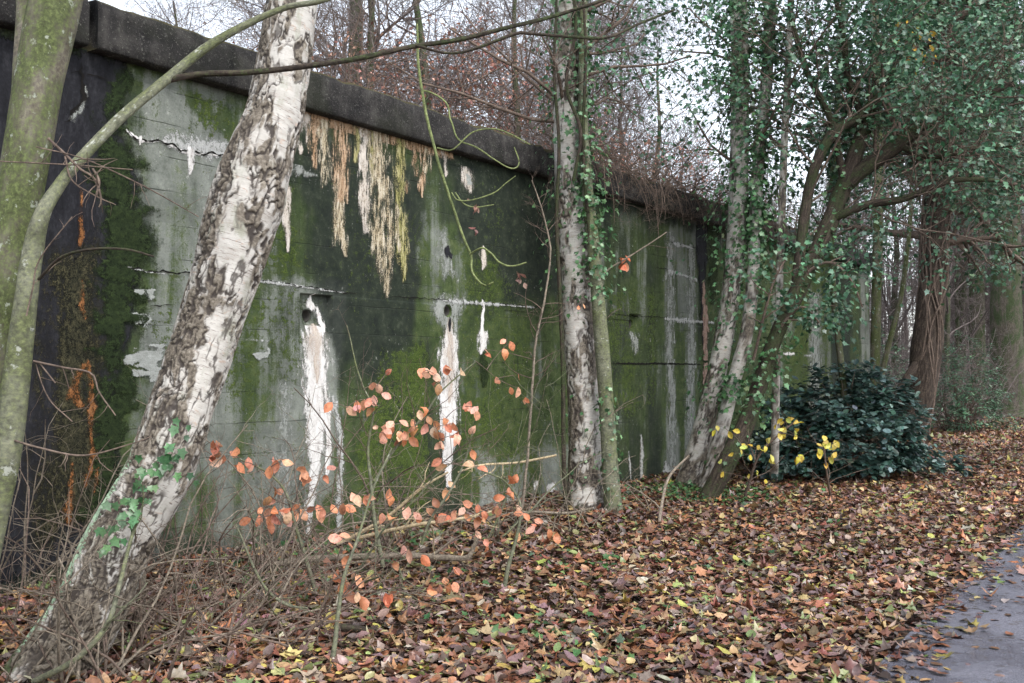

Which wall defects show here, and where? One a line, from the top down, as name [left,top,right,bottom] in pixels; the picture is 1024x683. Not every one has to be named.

crack [126,128,228,175]
leakage [282,112,454,296]
spalling [134,288,156,300]
leakage [434,295,463,332]
spalling [123,343,165,382]
leakage [665,221,720,470]
rust [63,360,99,526]